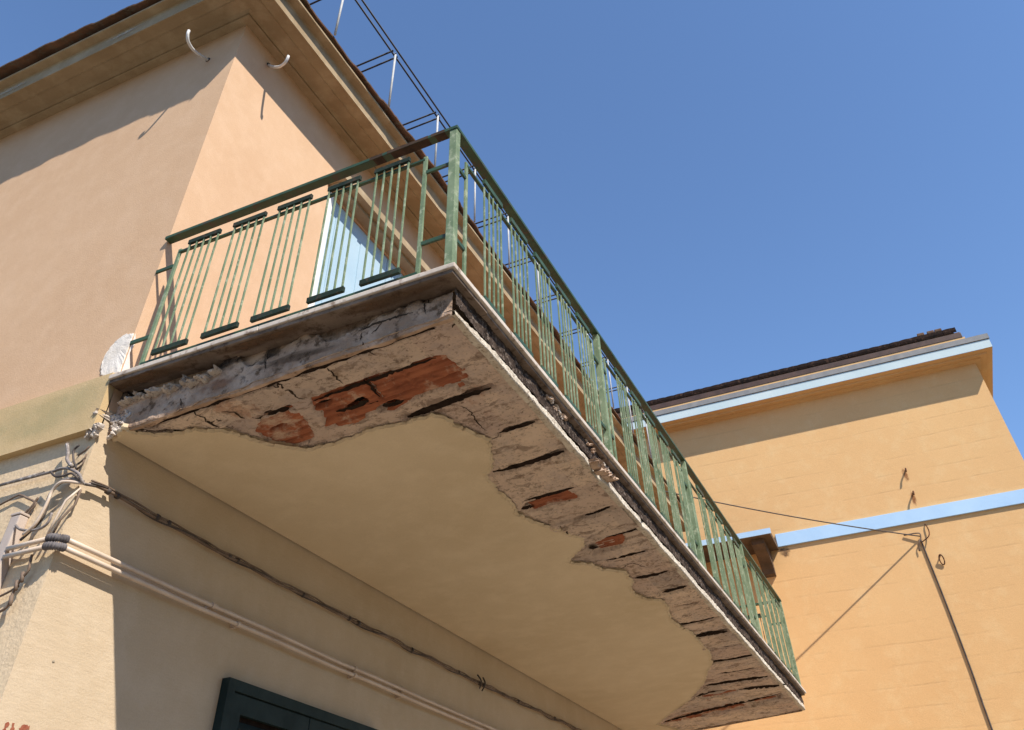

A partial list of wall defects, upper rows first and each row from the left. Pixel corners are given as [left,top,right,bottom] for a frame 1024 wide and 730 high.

crack [359,300,429,356]
crack [264,353,301,399]
crack [121,398,266,432]
spalling [84,314,800,730]